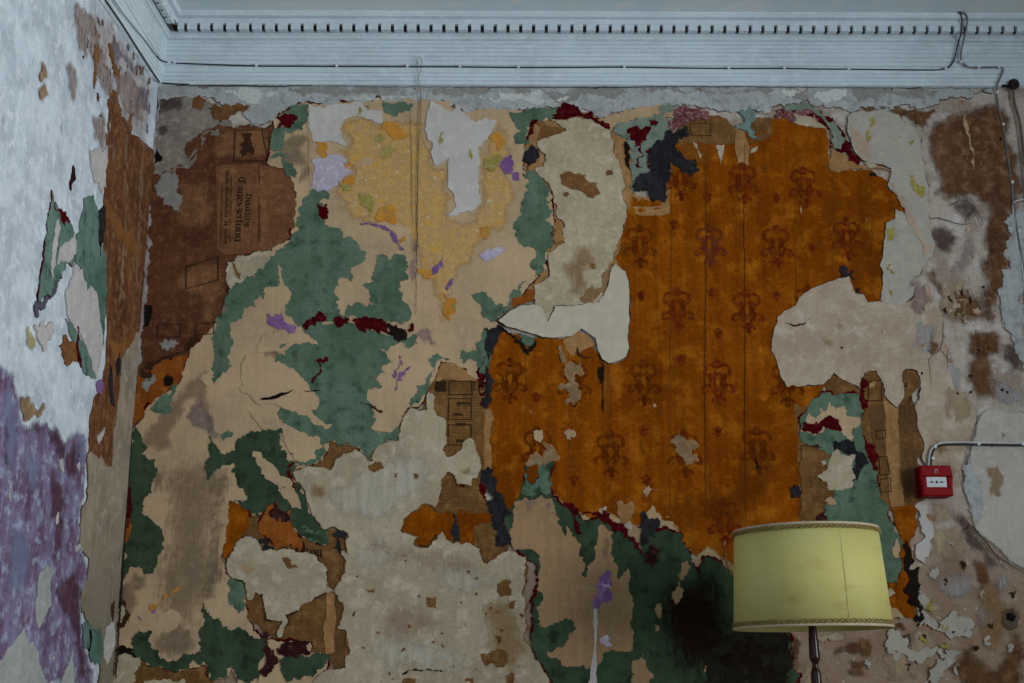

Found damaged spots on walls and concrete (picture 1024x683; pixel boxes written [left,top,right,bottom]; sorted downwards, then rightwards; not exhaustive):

peeling [39,61,48,101]
peeling [51,219,103,379]
peeling [67,3,993,495]
leakage [955,198,976,220]
leakage [910,213,1022,372]
leakage [946,365,973,420]
leakage [991,382,1024,405]
peeling [0,305,185,683]
peeling [226,391,551,683]
peeling [817,449,856,506]
peeling [915,499,934,564]
peeling [885,585,975,683]